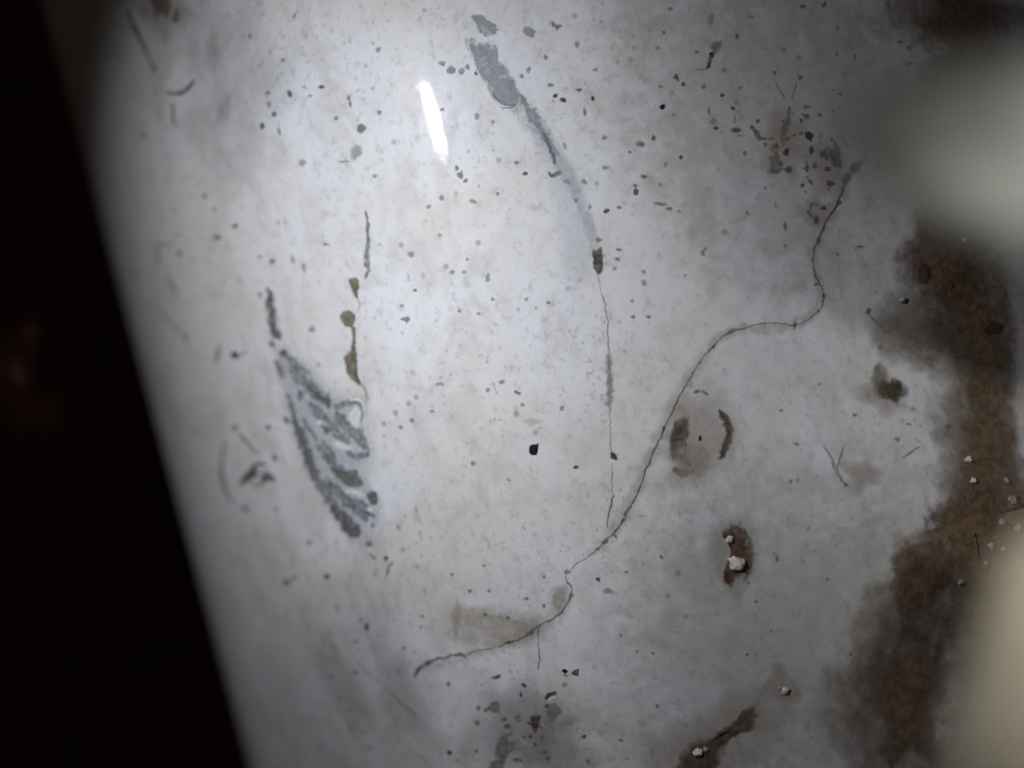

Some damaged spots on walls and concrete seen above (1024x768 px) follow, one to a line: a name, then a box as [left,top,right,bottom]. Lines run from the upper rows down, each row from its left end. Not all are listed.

crack [415,166,858,676]
corrosion [671,420,701,476]
corrosion [719,410,732,459]